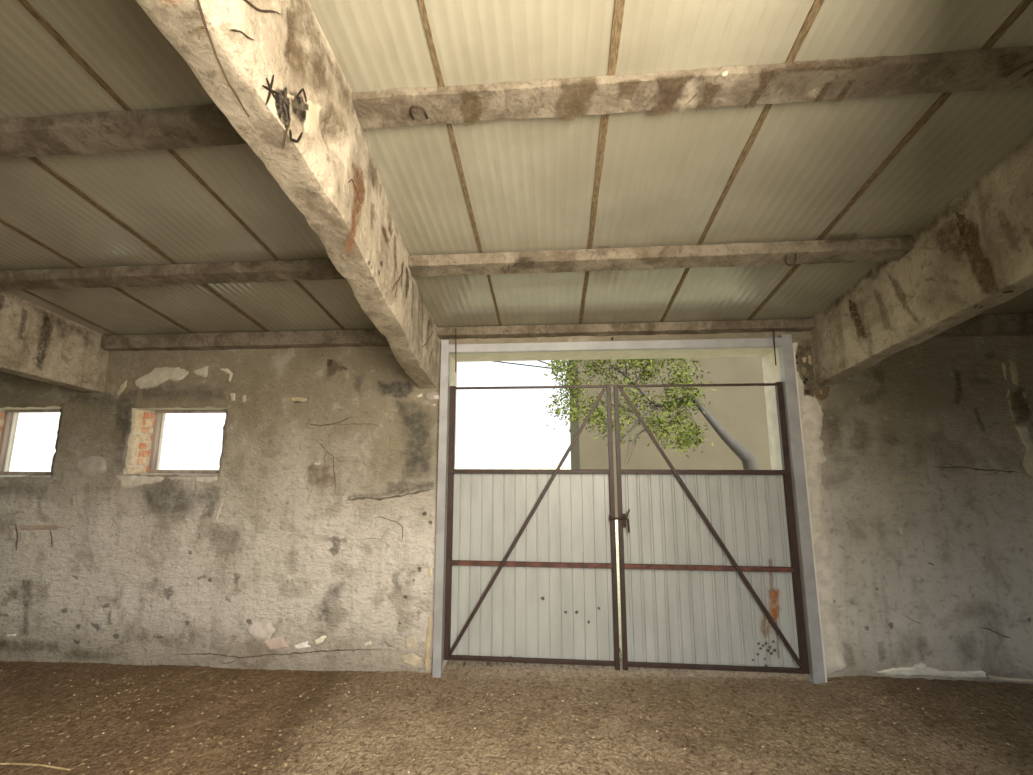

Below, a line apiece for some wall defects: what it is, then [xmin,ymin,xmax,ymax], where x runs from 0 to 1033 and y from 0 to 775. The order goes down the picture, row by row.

peeling [116,366,208,397]
peeling [221,368,246,402]
flaking render [796,345,830,401]
corrosion [769,590,779,621]